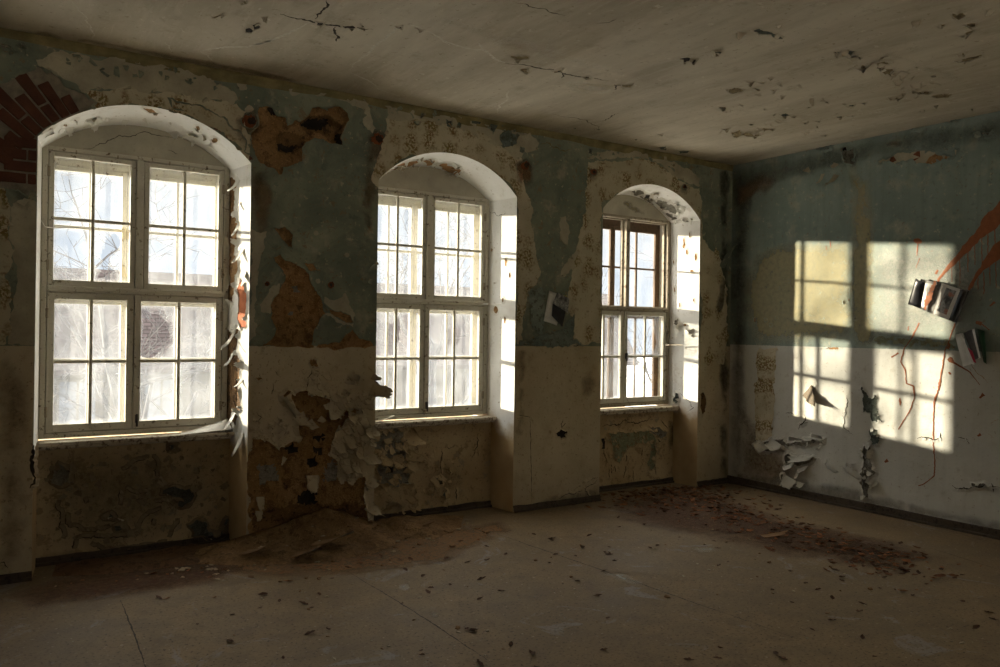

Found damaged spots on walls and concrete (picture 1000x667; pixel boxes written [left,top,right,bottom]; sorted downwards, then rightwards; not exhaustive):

crack [200,0,367,61]
crack [440,39,621,128]
peeling [677,50,724,65]
peeling [832,49,955,113]
flaking render [0,64,110,199]
flaking render [141,97,351,179]
peeling [628,189,699,275]
flaking render [219,172,414,534]
peeling [751,381,886,503]